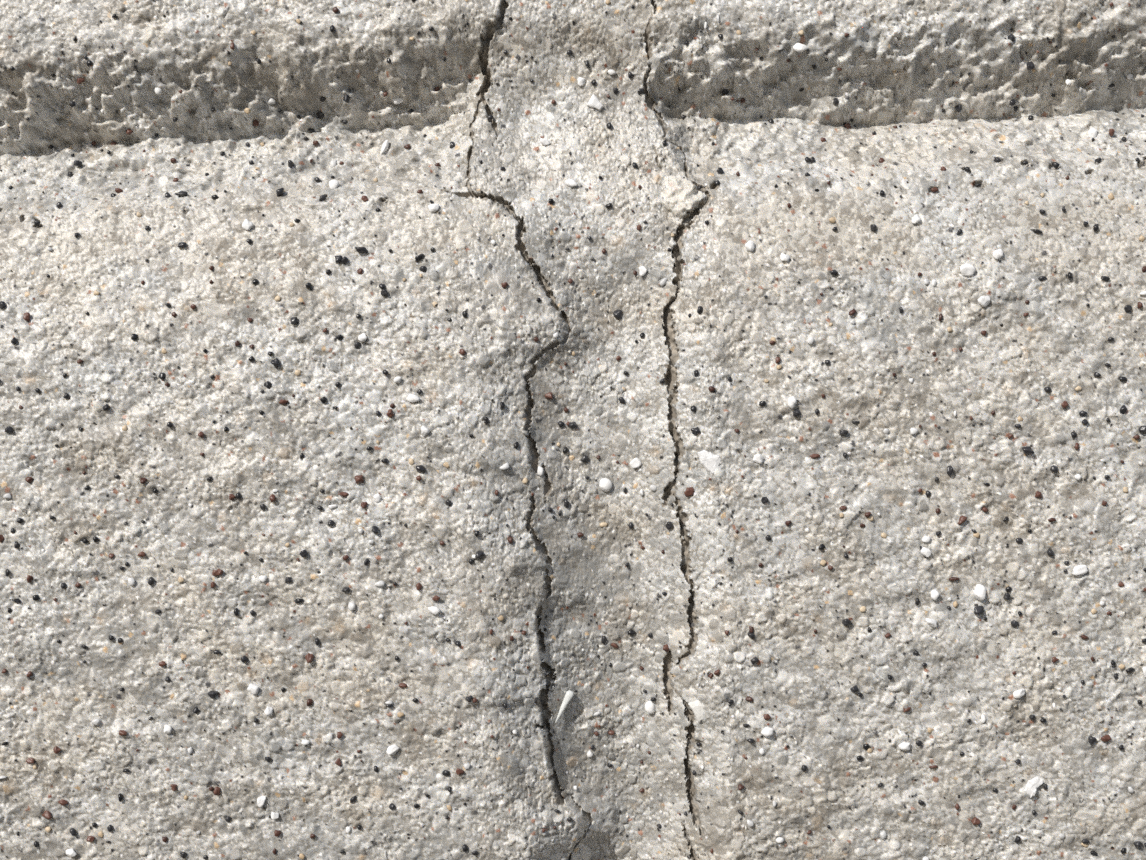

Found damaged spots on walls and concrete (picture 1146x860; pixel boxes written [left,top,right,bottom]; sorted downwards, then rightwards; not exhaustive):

crack [441,0,593,860]
crack [643,0,720,860]